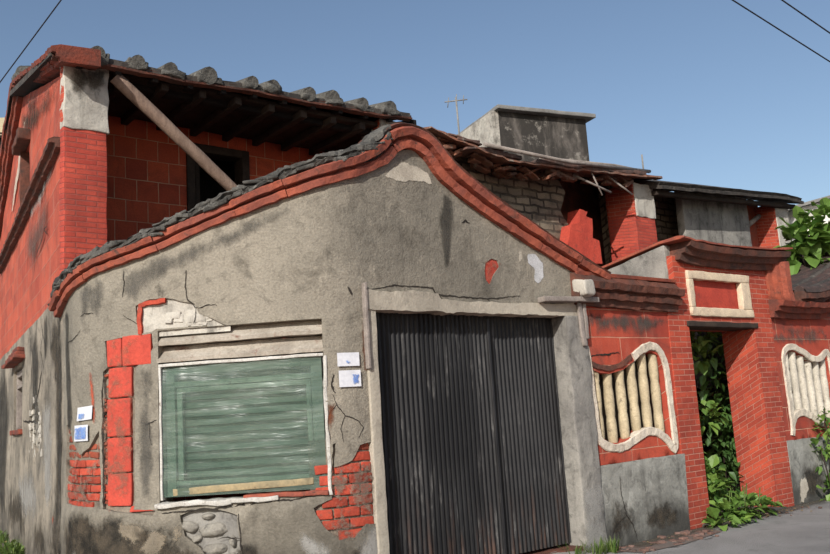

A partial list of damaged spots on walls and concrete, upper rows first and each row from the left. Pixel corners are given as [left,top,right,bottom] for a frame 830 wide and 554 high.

water stain [21,94,49,128]
water stain [440,195,451,266]
crack [184,272,217,324]
crack [373,284,520,301]
spalling [485,259,499,284]
spalling [28,397,42,458]
water stain [19,313,72,554]
spalling [66,298,231,515]
crack [328,374,364,442]
spalling [309,440,374,541]
spalling [182,509,240,554]